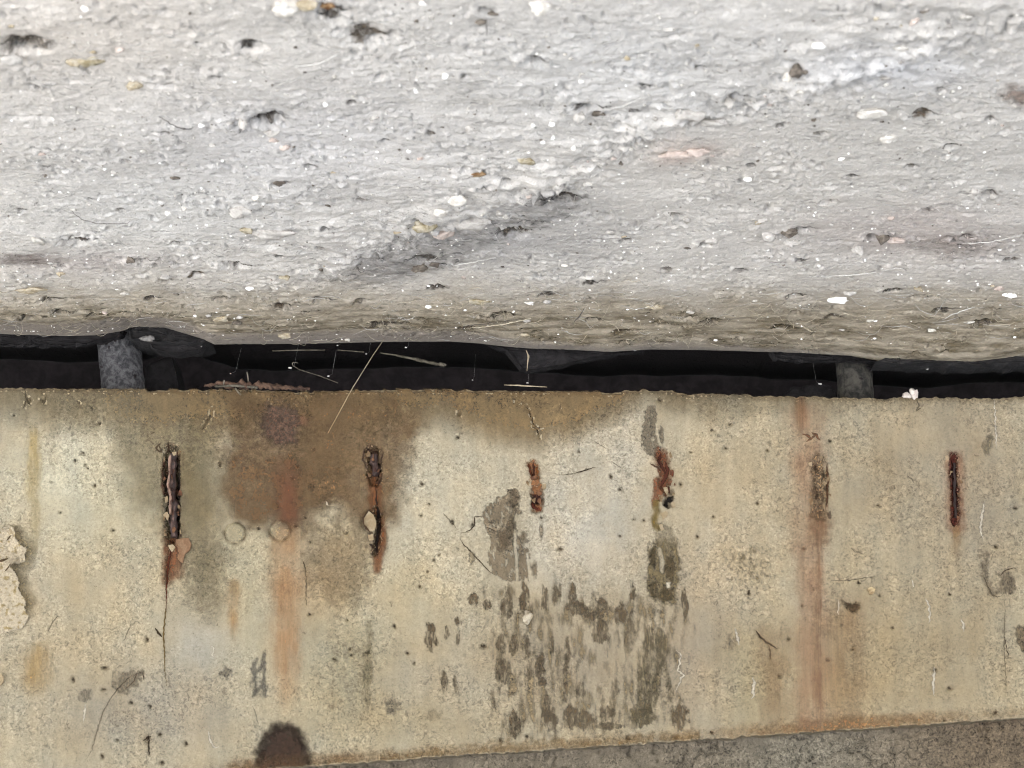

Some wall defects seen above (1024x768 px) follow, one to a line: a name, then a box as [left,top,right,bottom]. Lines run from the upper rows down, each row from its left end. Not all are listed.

water stain [0,389,748,604]
spalling [808,455,831,536]
corrosion [945,452,964,534]
peeling [0,526,34,635]
water stain [424,617,462,652]
water stain [467,488,695,742]
water stain [255,723,310,768]